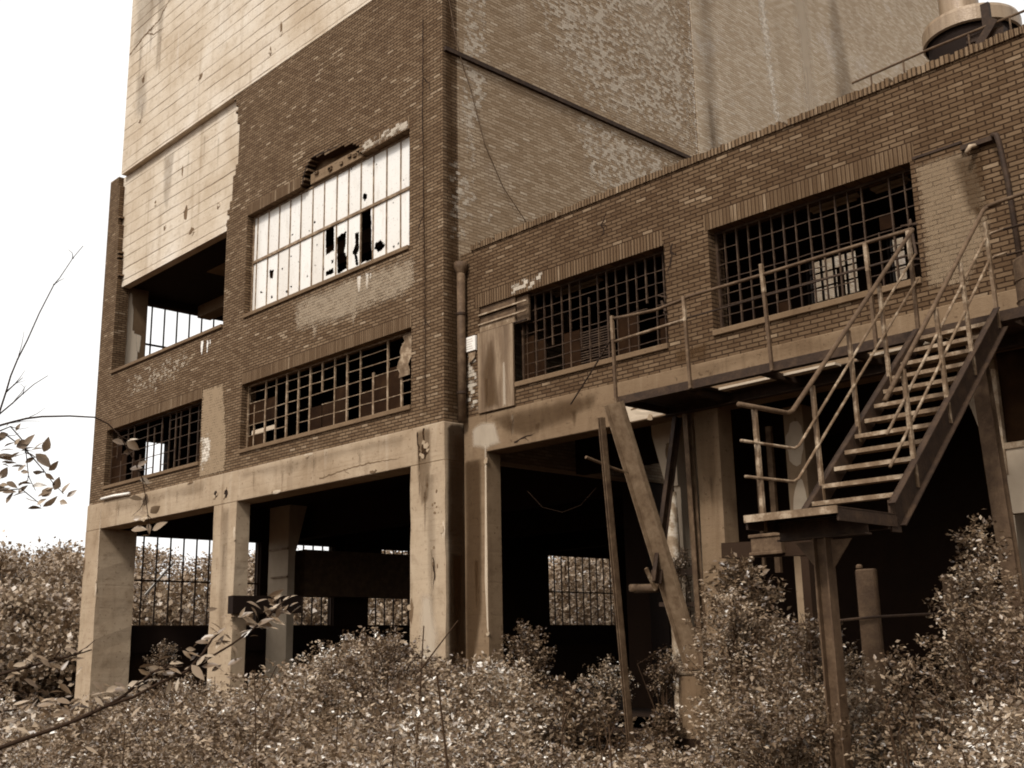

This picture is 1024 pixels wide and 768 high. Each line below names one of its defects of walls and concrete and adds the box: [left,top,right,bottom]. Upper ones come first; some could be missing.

crack [319,20,430,479]
water stain [423,600,433,661]